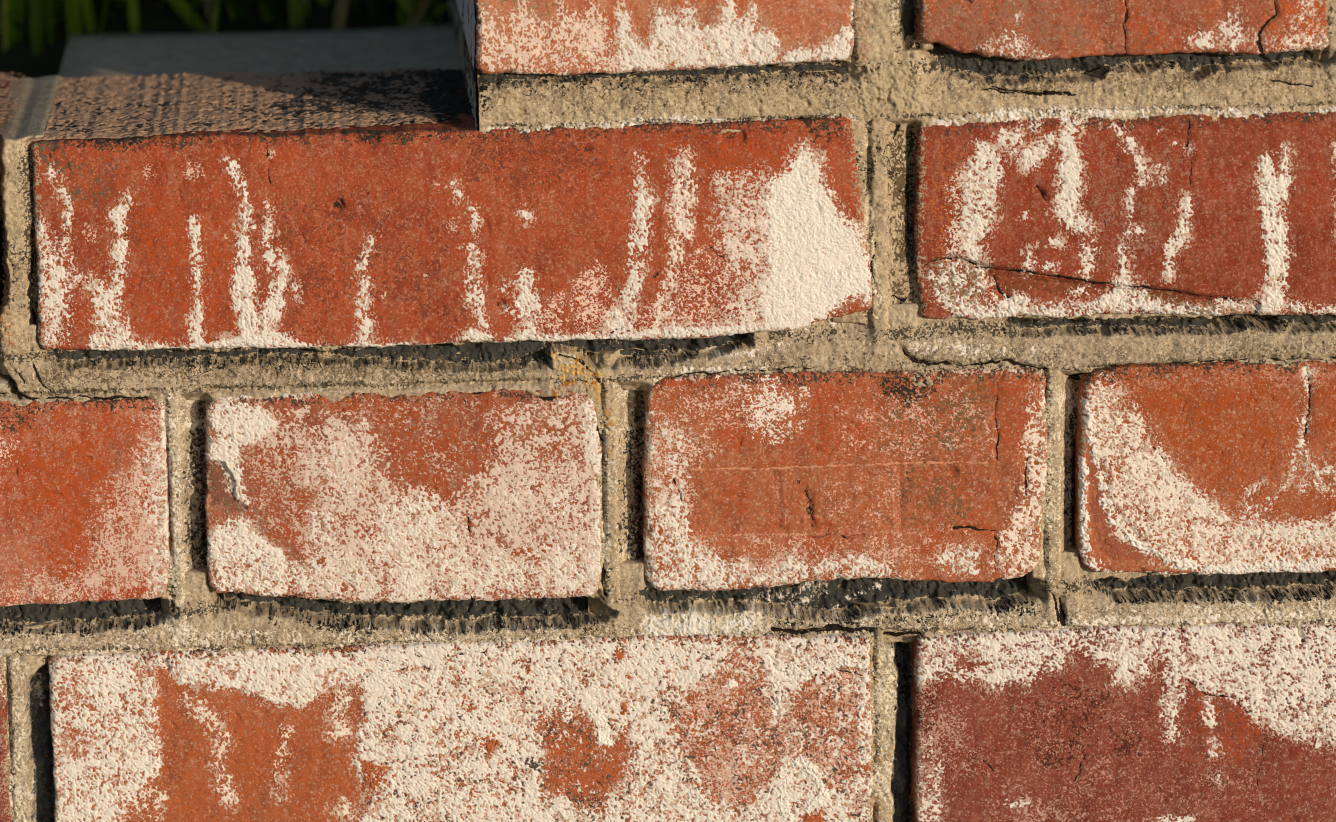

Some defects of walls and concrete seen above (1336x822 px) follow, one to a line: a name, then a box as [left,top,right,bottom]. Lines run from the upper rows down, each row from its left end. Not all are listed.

leakage [456,0,871,162]
crack [1122,0,1130,54]
crack [1256,0,1313,87]
leakage [34,136,889,363]
crack [925,257,1257,301]
crack [1160,356,1336,443]
leakage [0,335,1336,822]